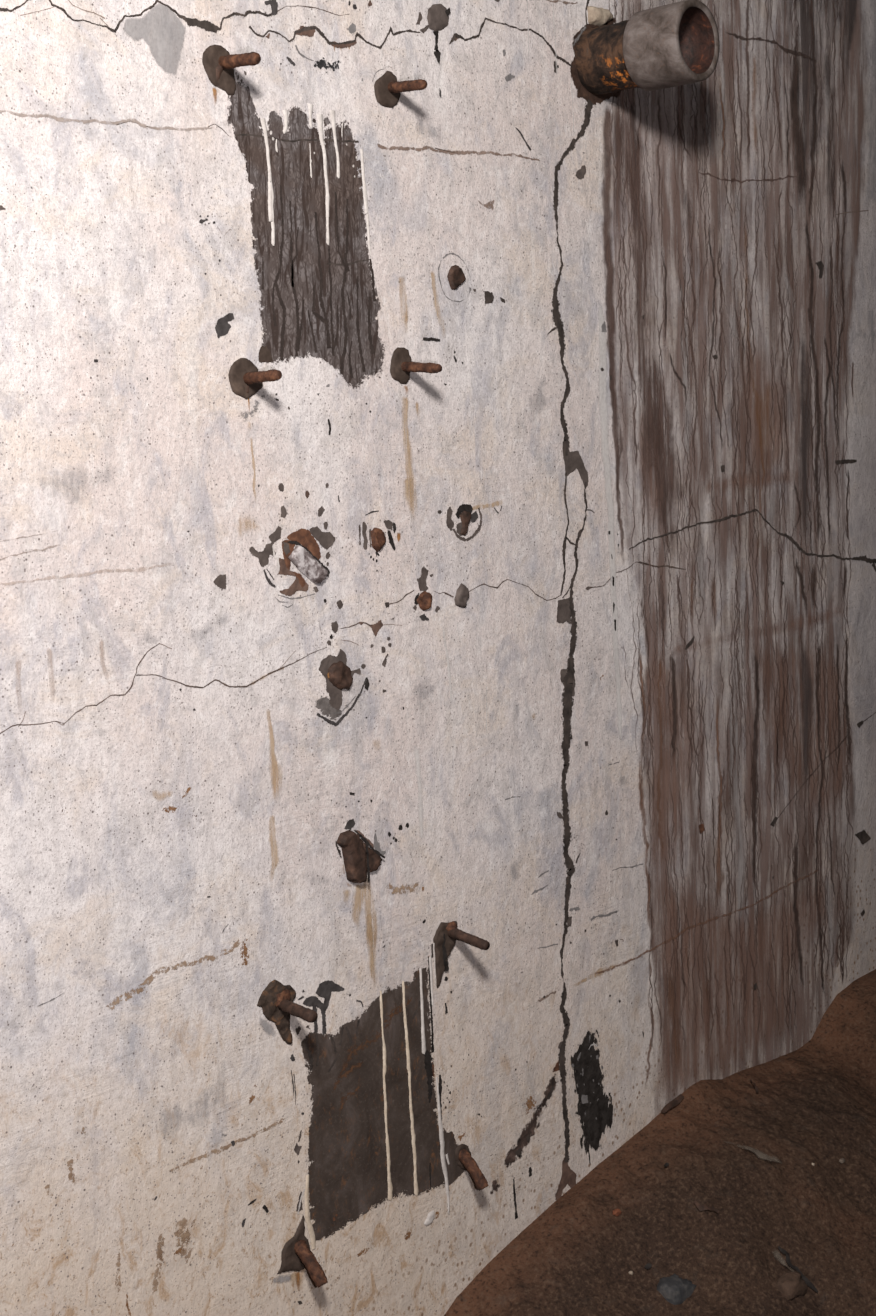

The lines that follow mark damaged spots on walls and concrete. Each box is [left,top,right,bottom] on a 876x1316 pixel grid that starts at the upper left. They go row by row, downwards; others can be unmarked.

crack [0,0,420,51]
crack [449,17,573,67]
peeling [226,71,385,413]
crack [0,590,414,734]
crack [437,99,876,1201]
water stain [603,0,864,1099]
peeling [290,934,469,1249]